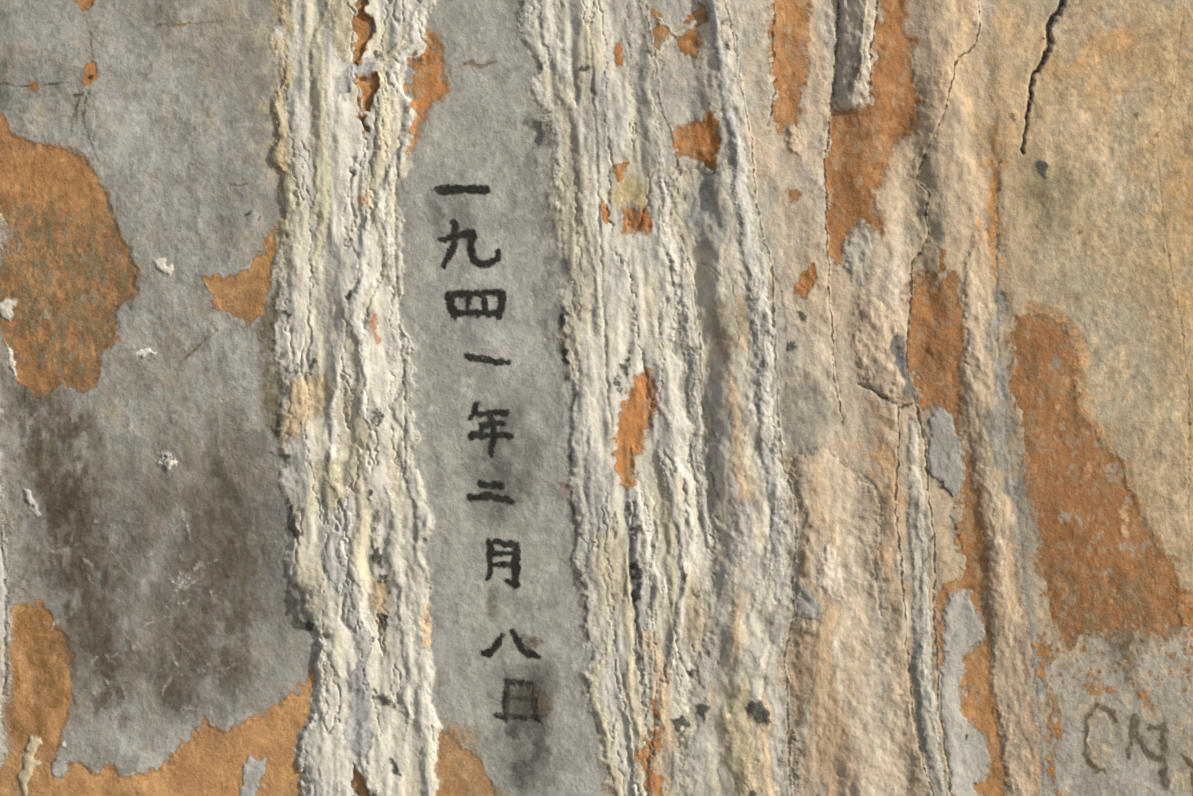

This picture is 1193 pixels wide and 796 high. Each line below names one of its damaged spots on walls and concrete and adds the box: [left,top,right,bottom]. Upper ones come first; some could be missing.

crack [995,0,1064,360]
peeling [0,114,139,399]
peeling [153,258,174,277]
peeling [202,229,279,326]
peeling [134,348,156,358]
crack [824,0,981,796]
peeling [925,407,965,497]
peeling [24,488,41,516]
peeling [0,598,316,796]
peeling [351,765,370,796]
peeling [434,727,495,796]